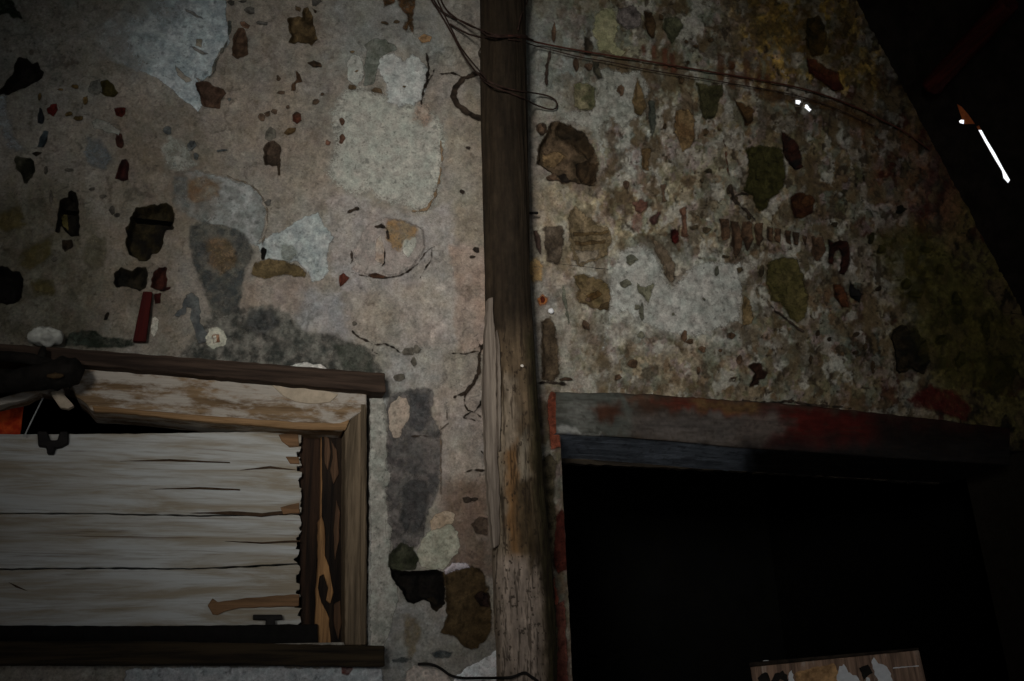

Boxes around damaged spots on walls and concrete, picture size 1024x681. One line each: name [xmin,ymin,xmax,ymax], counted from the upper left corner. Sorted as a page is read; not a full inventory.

flaking render [0,57,126,184]
flaking render [49,190,80,262]
peeling [89,162,306,304]
leakage [182,222,382,373]
crack [348,207,435,279]
leakage [386,388,441,549]
peeling [368,396,492,650]
crack [411,342,484,490]